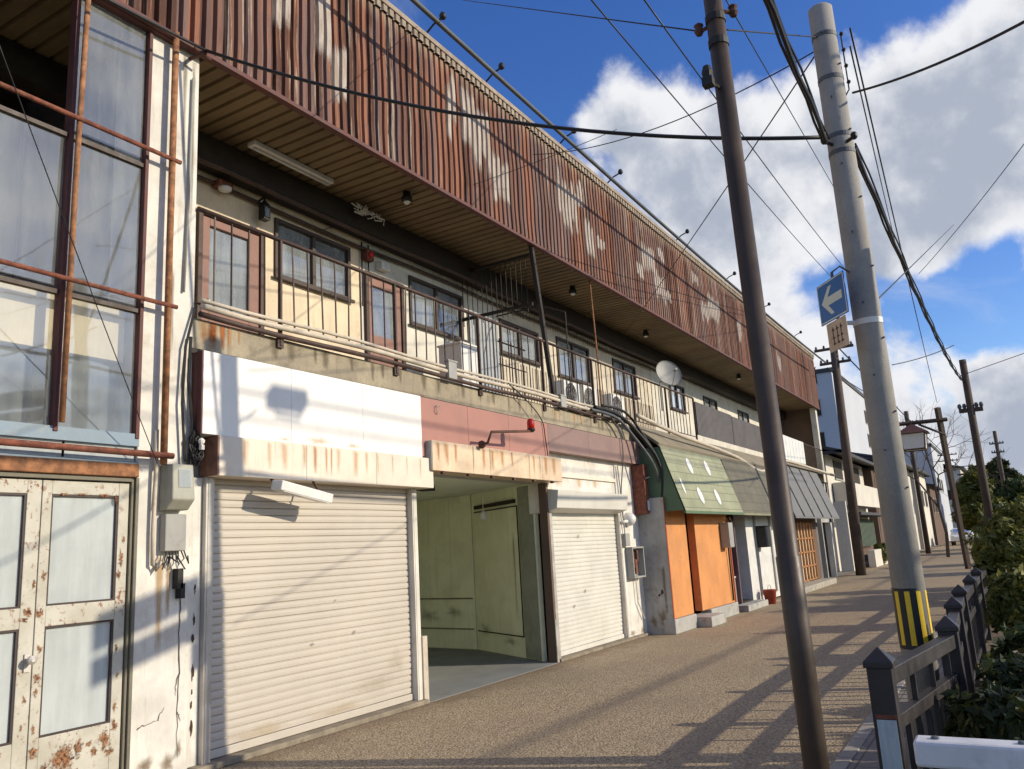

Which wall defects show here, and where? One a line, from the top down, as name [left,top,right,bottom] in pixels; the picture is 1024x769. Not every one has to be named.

rust [203,321,240,346]
rust [29,703,118,769]